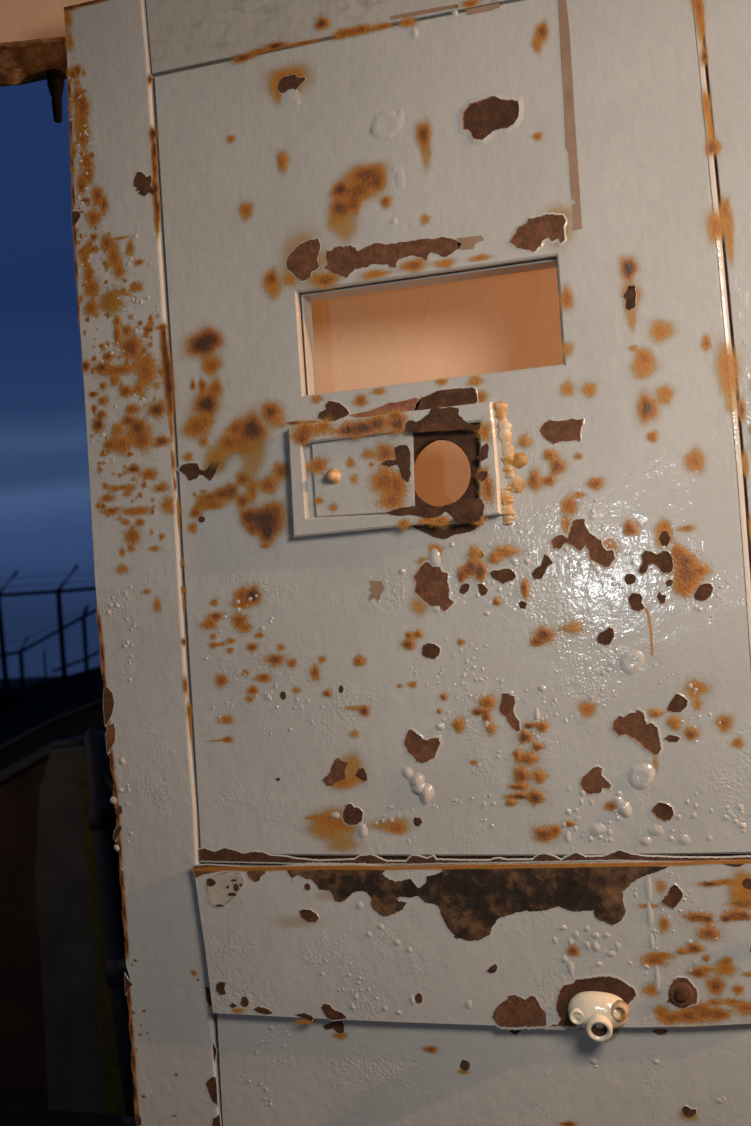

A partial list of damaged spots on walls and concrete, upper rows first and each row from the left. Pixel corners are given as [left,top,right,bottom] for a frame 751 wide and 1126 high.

peeling [457,91,524,146]
rust [64,0,454,573]
peeling [282,235,484,285]
peeling [317,386,487,482]
rust [474,467,495,525]
peeling [410,516,618,614]
rust [192,860,751,871]
peeling [192,847,751,943]
rust [640,881,670,932]
rust [699,878,734,888]
rust [641,899,751,1025]
peeling [490,974,639,1035]